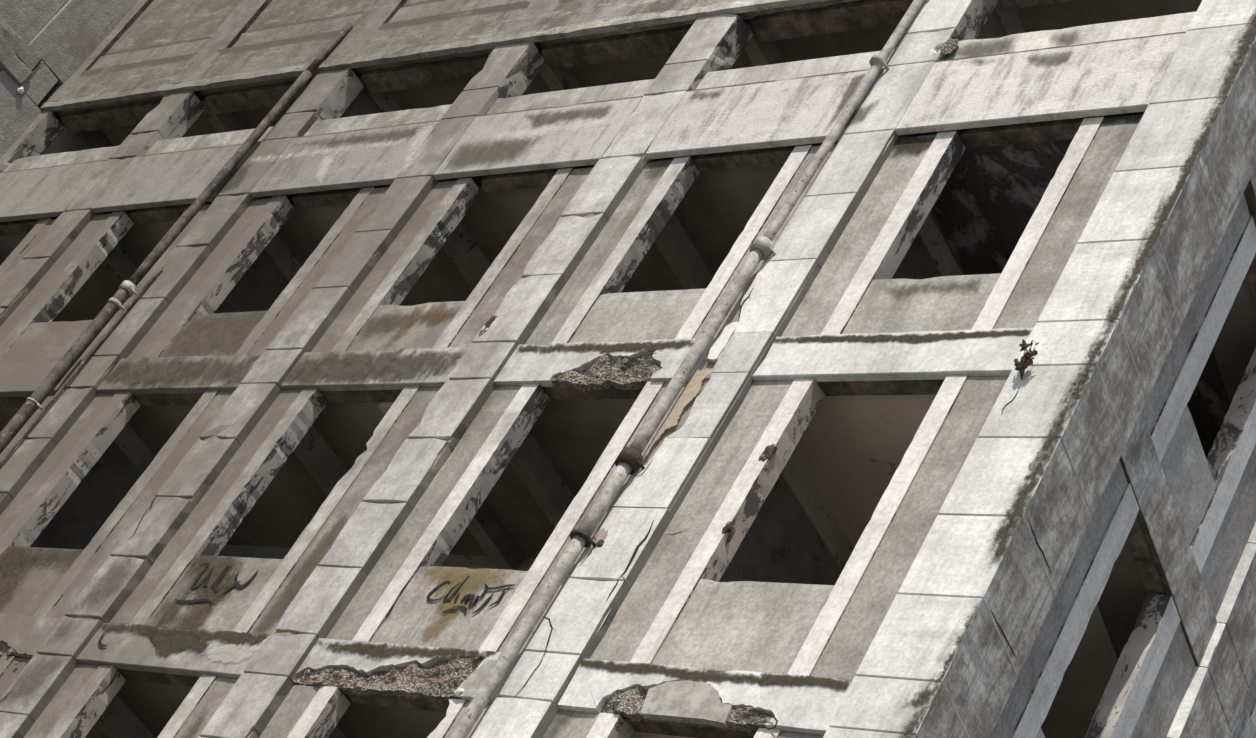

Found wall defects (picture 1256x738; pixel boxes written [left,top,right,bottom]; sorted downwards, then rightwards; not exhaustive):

water stain [991,14,1256,561]
water stain [366,311,455,333]
spalling [550,351,661,392]
water stain [0,546,84,608]
crack [606,520,691,601]
spalling [0,641,33,665]
spalling [293,648,496,702]
spalling [601,680,775,733]